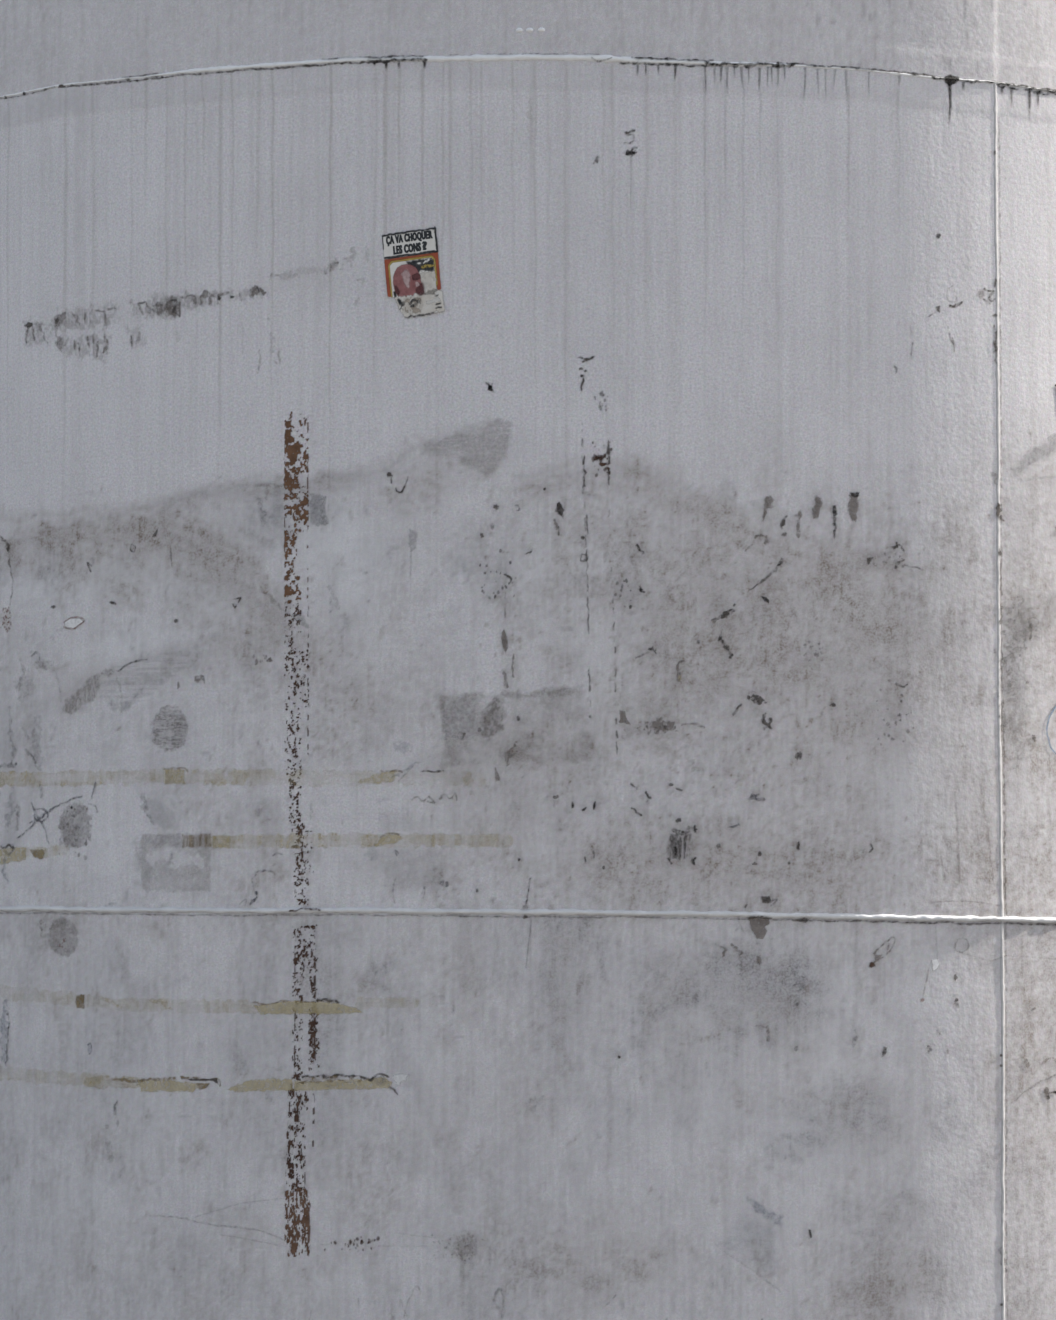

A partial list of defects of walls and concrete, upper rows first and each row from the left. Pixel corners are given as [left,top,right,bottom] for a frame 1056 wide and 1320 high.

leakage [369,55,427,68]
leakage [621,57,1056,115]
corrosion [284,412,314,905]
corrosion [284,925,379,1257]